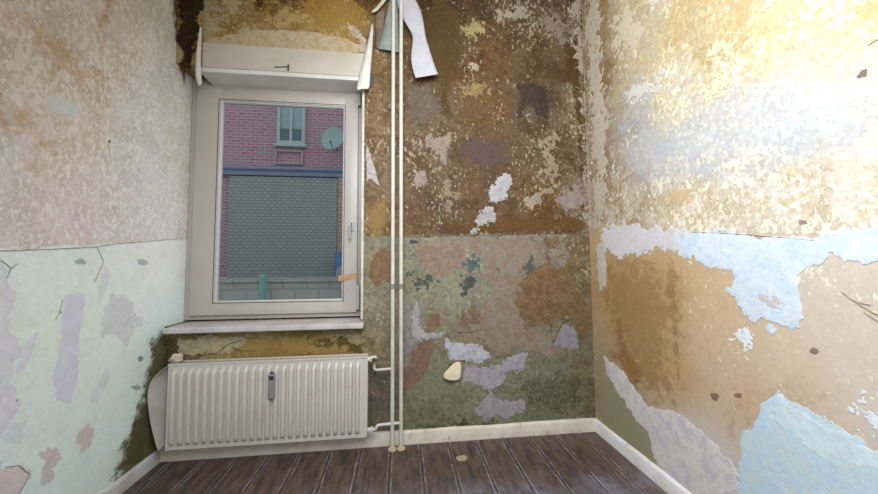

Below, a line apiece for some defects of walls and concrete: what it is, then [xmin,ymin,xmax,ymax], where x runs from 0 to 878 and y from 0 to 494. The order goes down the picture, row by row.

leakage [173,0,205,81]
peeling [366,147,380,185]
peeling [403,125,464,218]
flaking render [456,0,689,291]
peeling [52,292,85,404]
peeling [100,293,143,349]
peeling [177,334,248,360]
flaking render [367,247,391,287]
flaking render [398,173,593,421]
leakage [115,333,180,481]
flaking render [603,356,739,494]
peeling [848,390,878,439]